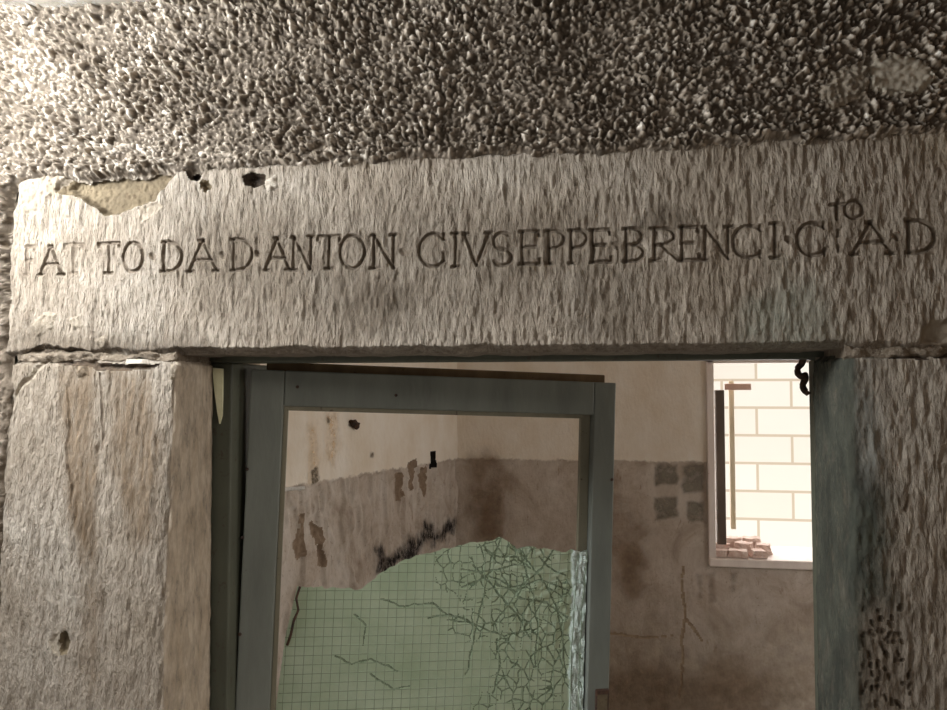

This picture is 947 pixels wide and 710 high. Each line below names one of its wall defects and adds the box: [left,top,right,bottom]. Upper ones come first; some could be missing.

spalling [55,174,173,222]
crack [15,343,159,509]
peeling [395,451,437,501]
peeling [292,513,327,567]
leakage [374,519,457,572]
crack [434,538,584,710]